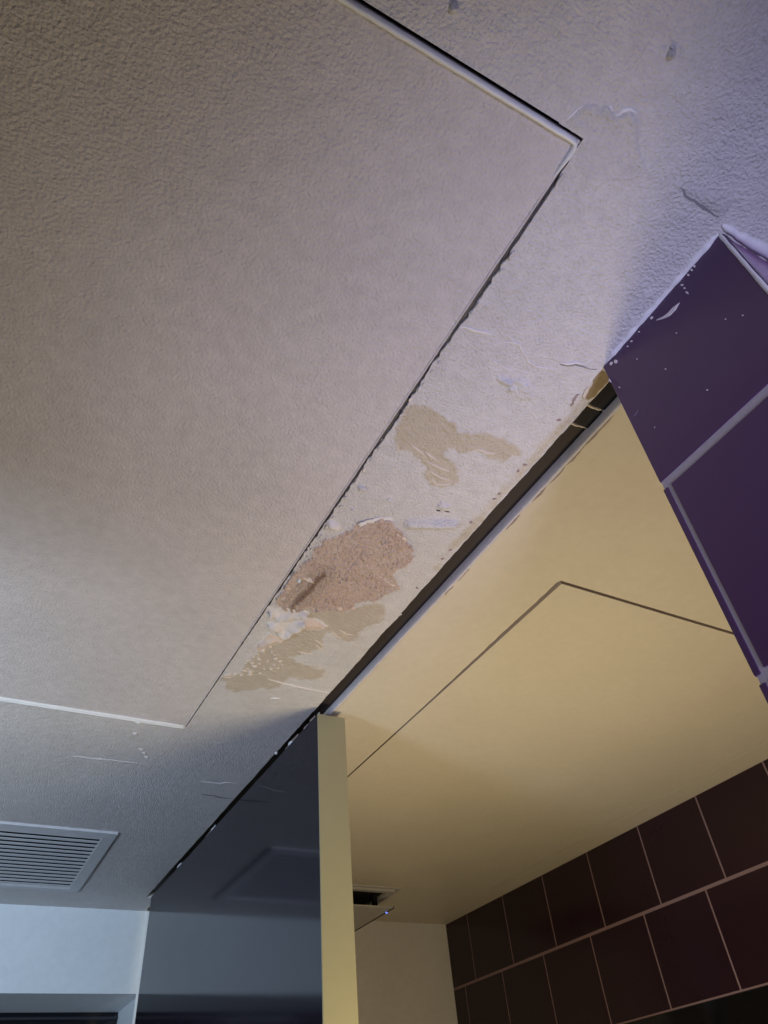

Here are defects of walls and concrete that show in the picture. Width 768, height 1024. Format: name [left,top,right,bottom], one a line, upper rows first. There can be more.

crack [680,186,731,218]
damp [383,395,526,492]
peeling [254,496,419,652]
damp [217,598,402,699]